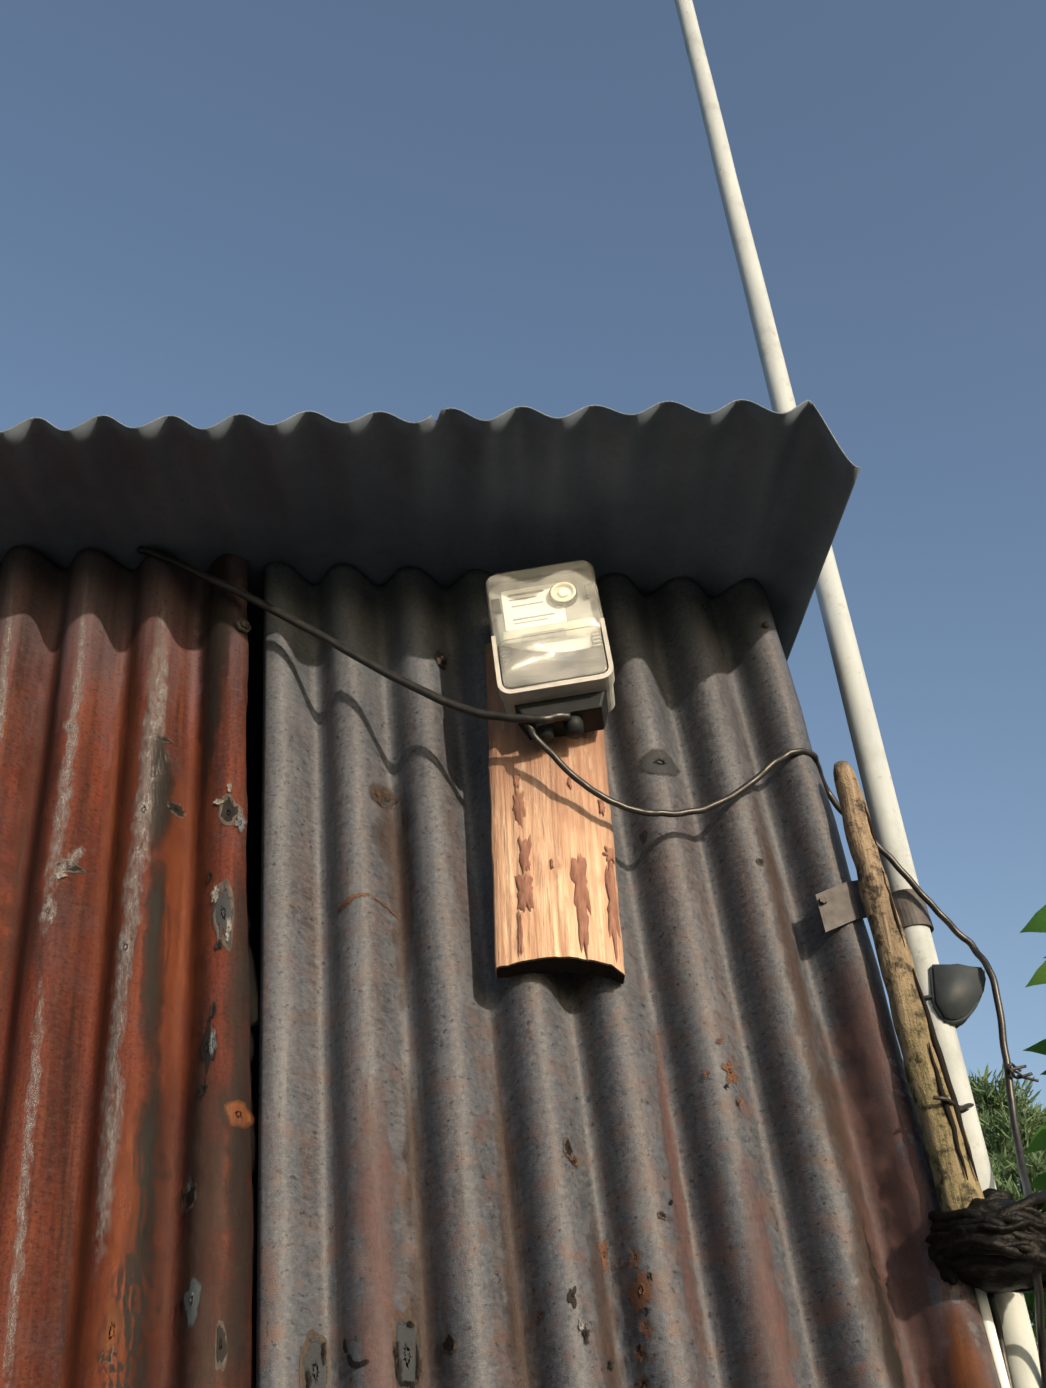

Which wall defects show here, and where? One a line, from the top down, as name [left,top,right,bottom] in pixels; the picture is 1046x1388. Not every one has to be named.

corrosion [99,667,135,1022]
peeling [207,870,235,952]
peeling [199,1002,217,1096]
corrosion [225,1101,252,1127]
corrosion [65,1098,226,1388]
peeling [178,1277,202,1326]
corrosion [594,1239,620,1388]
corrosion [628,1247,654,1388]